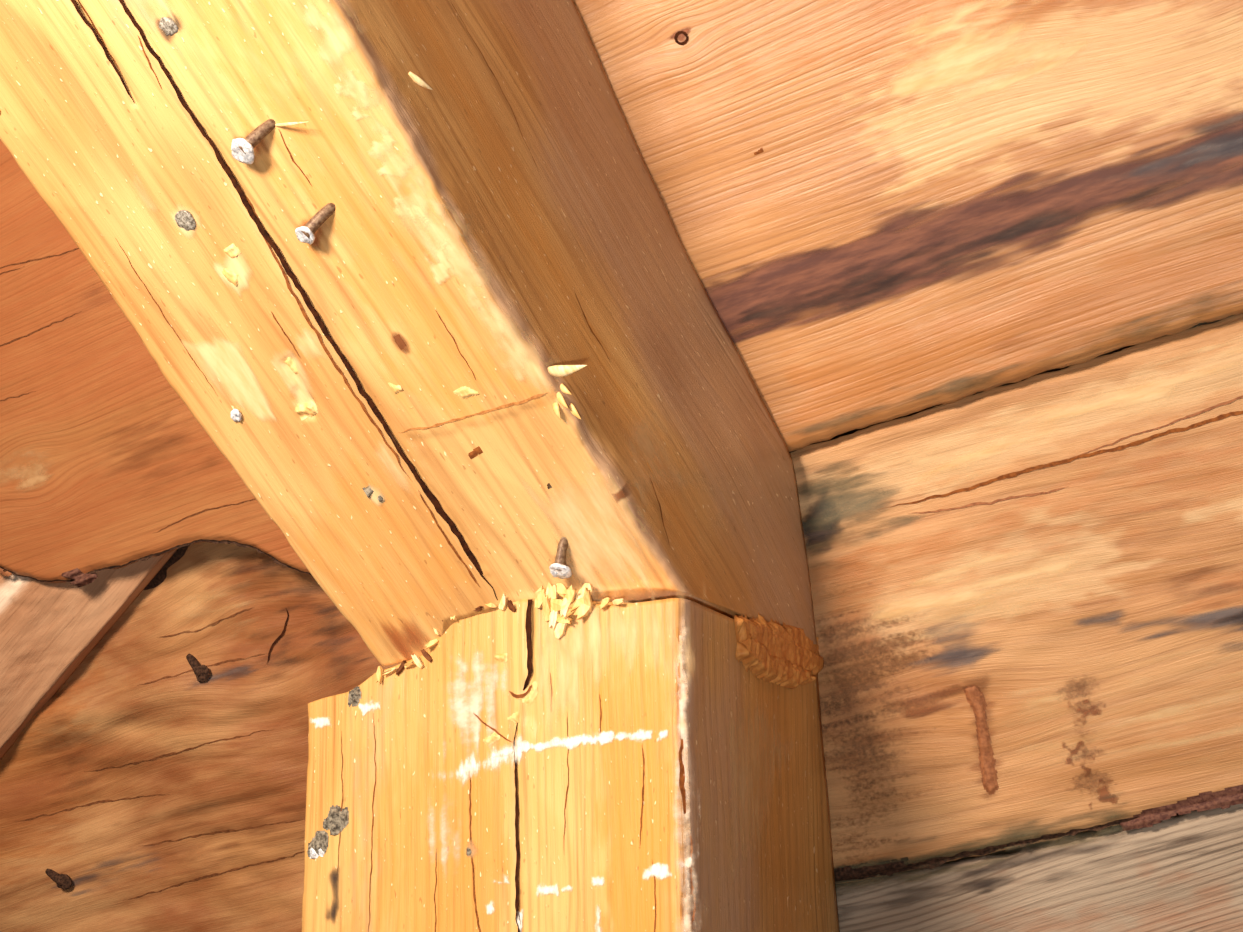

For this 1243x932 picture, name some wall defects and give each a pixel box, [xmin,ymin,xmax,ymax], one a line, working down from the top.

water stain [705,114,1243,343]
crack [71,0,498,600]
water stain [799,468,892,548]
crack [882,395,1243,514]
crack [139,607,289,685]
water stain [905,686,981,717]
water stain [930,648,987,665]
water stain [1183,607,1243,629]
crack [125,851,305,900]
crack [337,717,376,929]
crack [469,771,481,932]
crack [473,599,569,932]